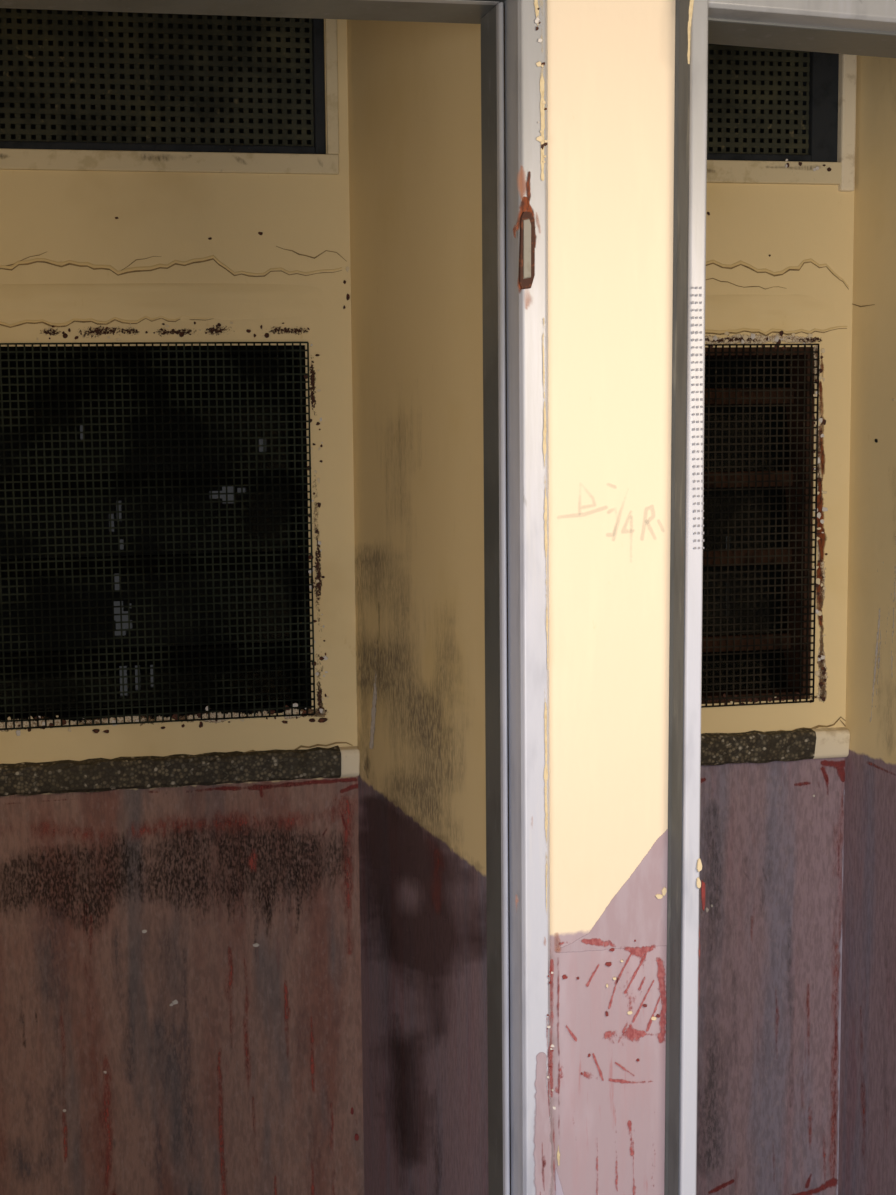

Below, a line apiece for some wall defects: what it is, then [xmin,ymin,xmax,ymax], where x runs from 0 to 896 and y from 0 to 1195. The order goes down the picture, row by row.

peeling [534,0,542,43]
peeling [536,61,548,181]
corrosion [513,171,534,238]
crack [0,246,347,277]
crack [0,315,214,328]
crack [705,259,875,336]
damp [0,778,358,933]